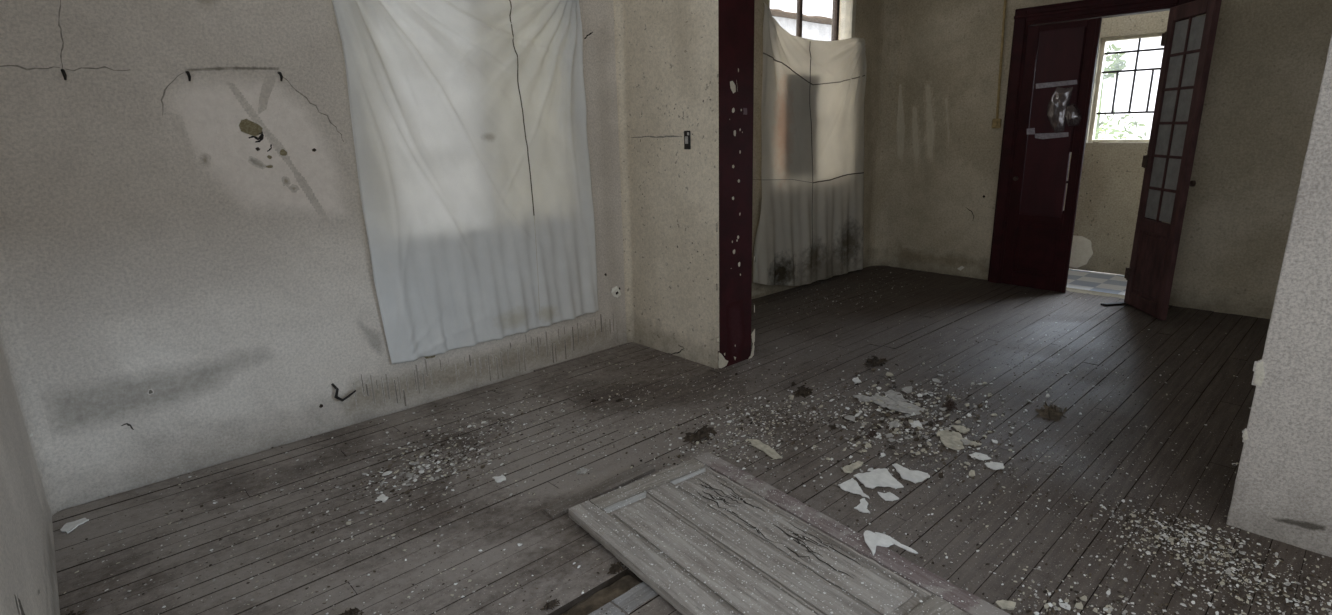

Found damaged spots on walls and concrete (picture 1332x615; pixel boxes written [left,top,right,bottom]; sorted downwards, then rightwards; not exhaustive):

crack [0,0,131,71]
crack [161,73,183,116]
crack [283,77,344,142]
peeling [729,68,743,216]
peeling [716,287,774,369]